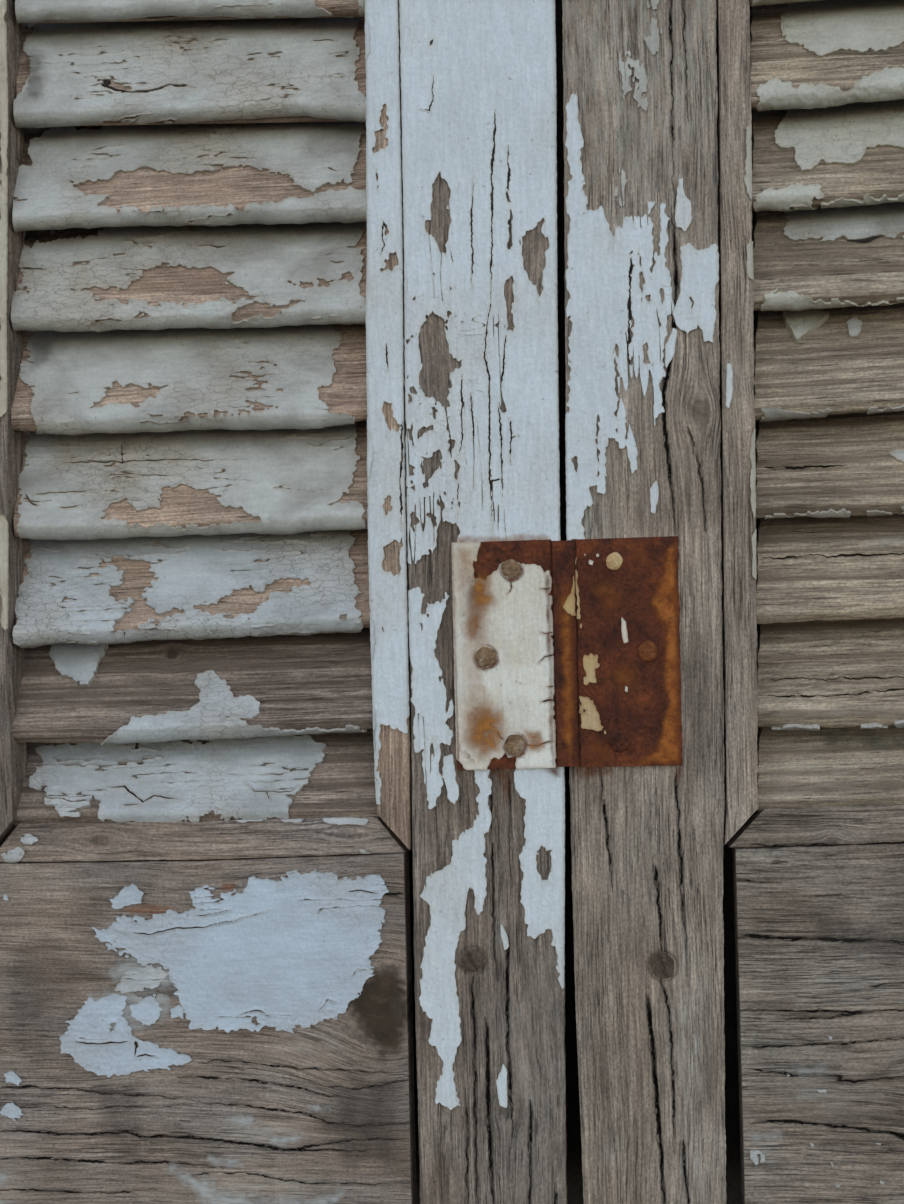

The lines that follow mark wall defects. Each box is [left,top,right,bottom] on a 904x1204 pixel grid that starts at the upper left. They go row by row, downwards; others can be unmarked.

peeling [752,0,904,58]
peeling [744,67,904,243]
peeling [760,289,904,344]
peeling [0,0,719,1110]
corrosion [471,577,492,635]
corrosion [457,708,542,757]
corrosion [547,598,572,744]
corrosion [643,547,678,762]
crack [646,771,690,1204]
peeling [0,1102,24,1121]